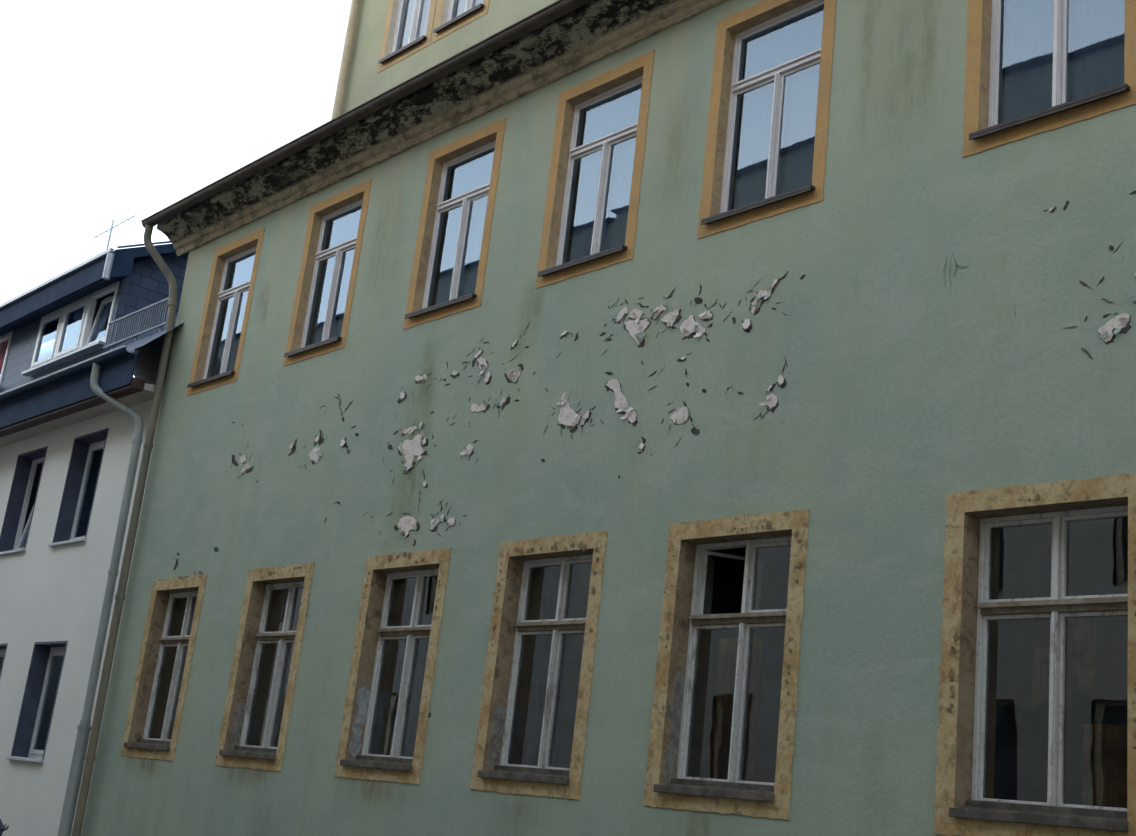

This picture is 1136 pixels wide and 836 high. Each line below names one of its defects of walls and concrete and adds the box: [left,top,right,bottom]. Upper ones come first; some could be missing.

peeling [599,271,806,393]
peeling [1079,275,1136,345]
peeling [230,443,258,483]
peeling [288,430,327,470]
peeling [319,394,359,454]
peeling [364,322,537,564]
peeling [544,388,604,438]
peeling [604,372,653,456]
peeling [661,401,700,447]
peeling [753,356,788,421]